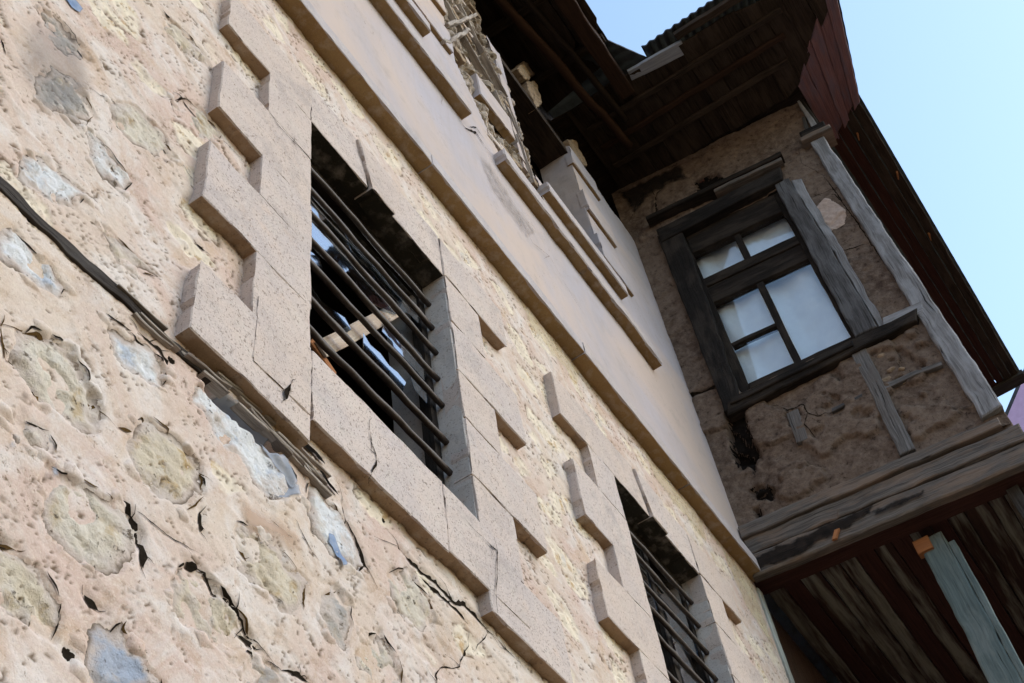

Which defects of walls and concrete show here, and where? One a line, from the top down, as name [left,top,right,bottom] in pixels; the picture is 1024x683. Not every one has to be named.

crack [88,405,144,432]
crack [368,419,377,478]
spalling [728,411,775,518]
crack [774,396,850,436]
crack [124,473,309,683]
crack [336,479,520,683]